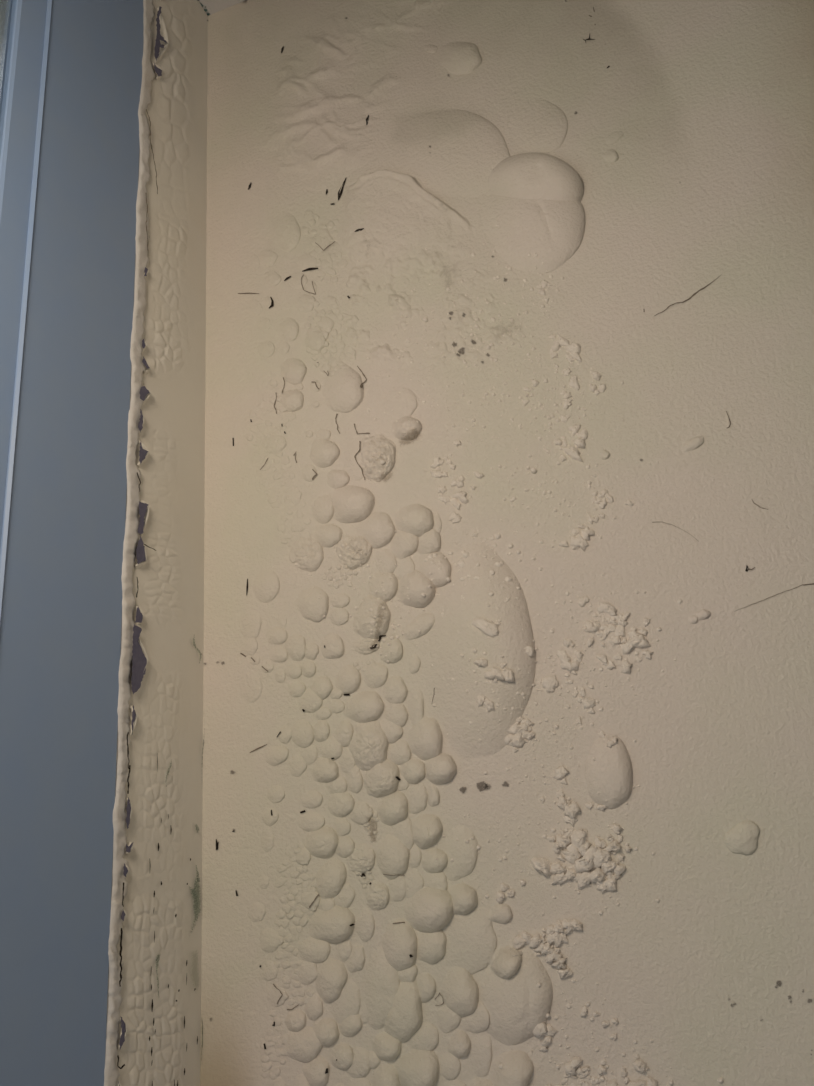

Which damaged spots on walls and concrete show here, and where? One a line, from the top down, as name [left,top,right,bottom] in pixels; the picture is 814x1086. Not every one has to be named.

crack [146,109,158,250]
peeling [137,339,151,468]
peeling [135,500,149,569]
peeling [129,605,148,737]
crack [124,732,132,794]
crack [117,882,125,987]